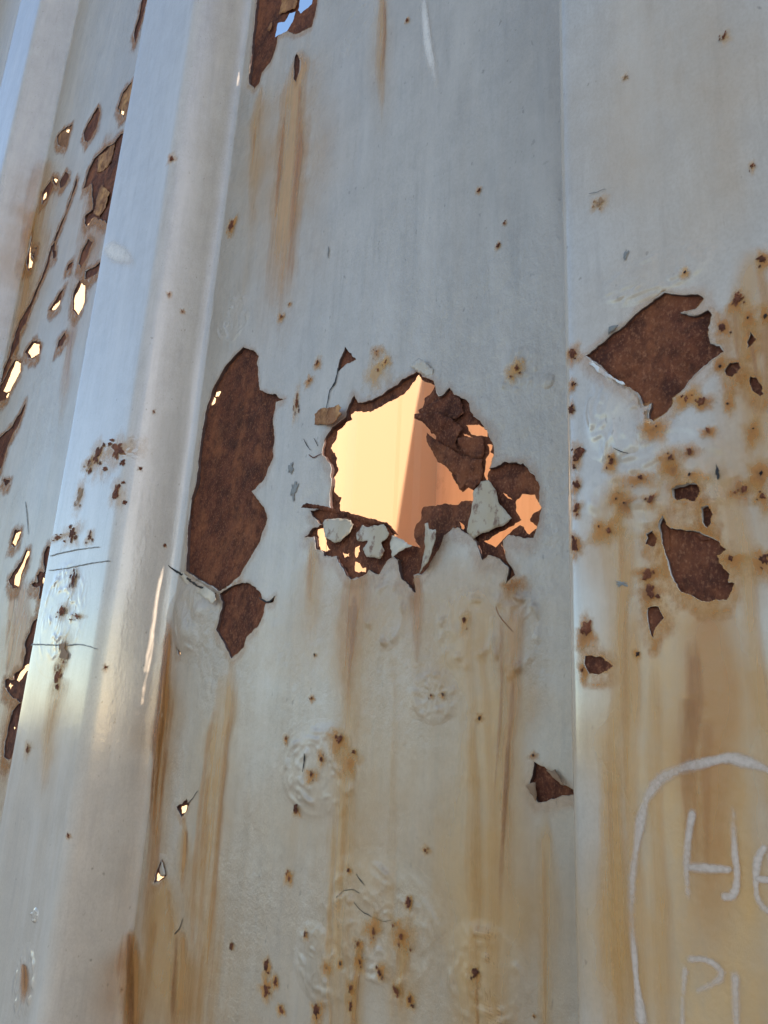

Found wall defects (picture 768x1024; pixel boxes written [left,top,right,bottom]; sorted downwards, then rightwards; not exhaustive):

peeling [64,236,100,288]
rust [566,291,768,441]
peeling [83,439,126,474]
peeling [414,390,512,538]
peeling [29,525,93,611]
peeling [323,518,389,559]
rust [151,632,171,844]
peeling [526,762,574,803]
rust [571,442,768,1024]
rust [121,934,139,1024]
rust [260,958,278,999]
rust [320,917,415,1022]